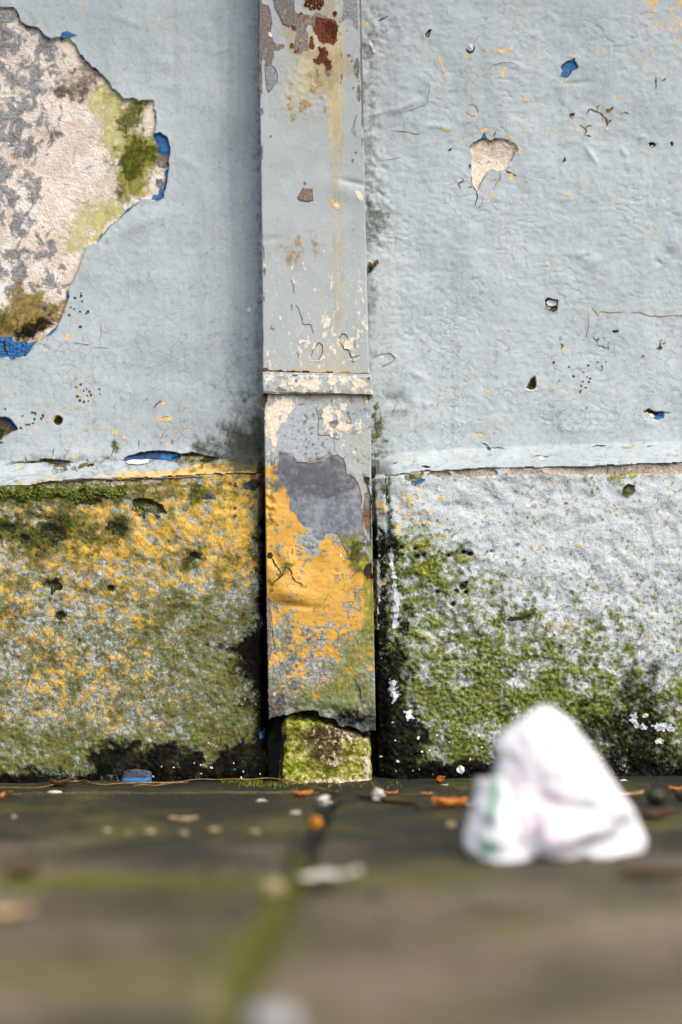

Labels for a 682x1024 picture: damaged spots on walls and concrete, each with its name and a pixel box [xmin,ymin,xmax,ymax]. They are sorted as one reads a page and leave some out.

corrosion [285,0,348,121]
peeling [560,56,579,82]
peeling [0,7,170,359]
peeling [458,124,527,206]
spalling [0,375,101,443]
spalling [41,455,185,489]
peeling [265,374,372,560]
spalling [644,408,670,419]
water stain [252,519,266,543]
water stain [0,556,276,783]
water stain [370,509,493,779]
water stain [579,659,682,772]